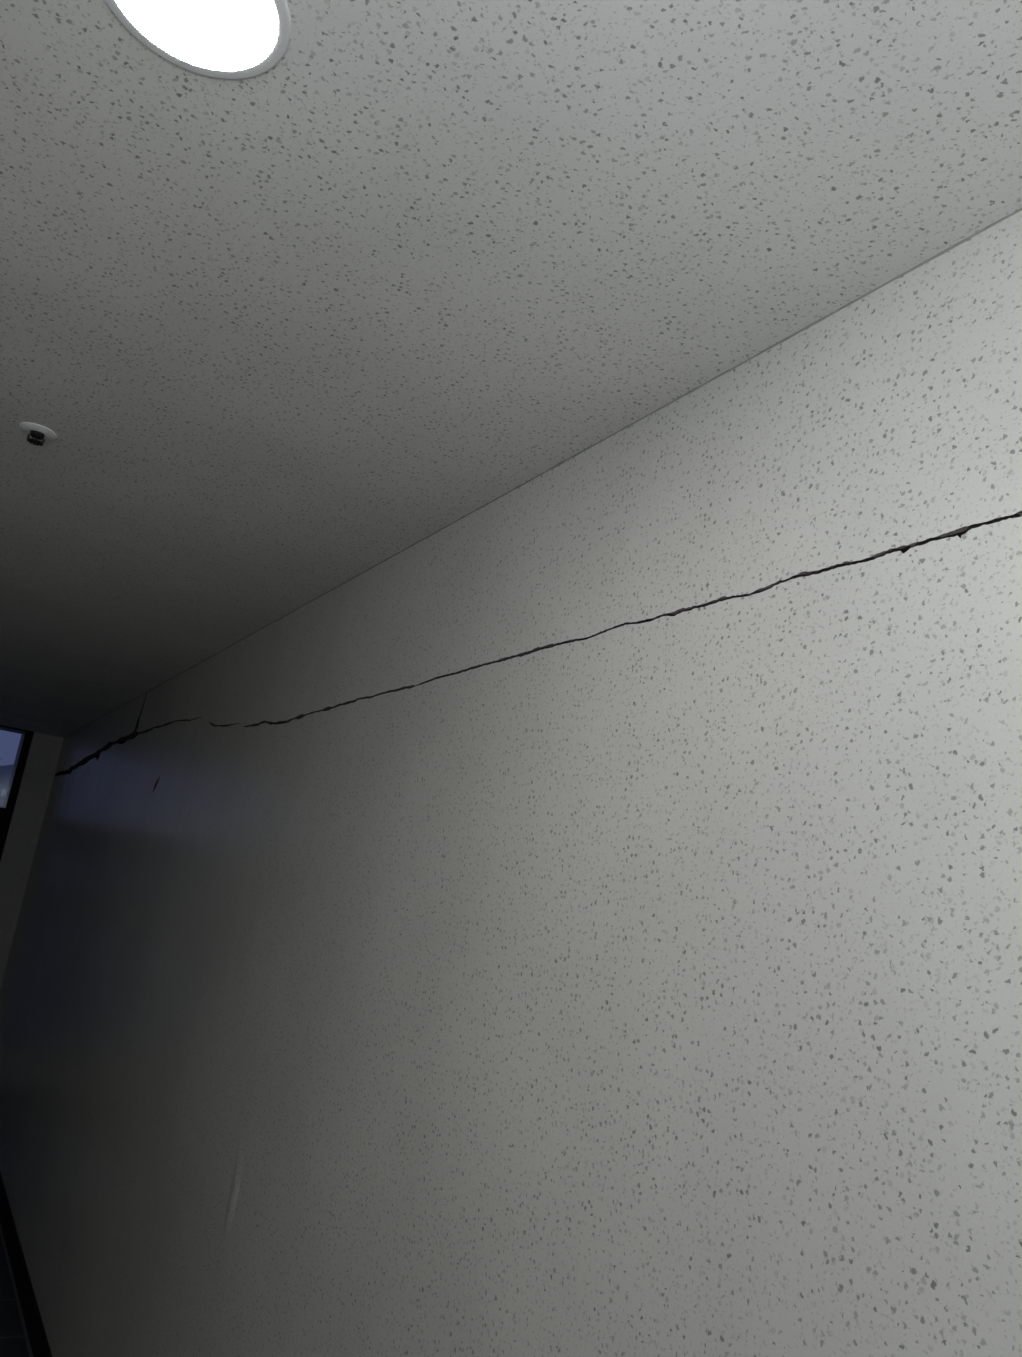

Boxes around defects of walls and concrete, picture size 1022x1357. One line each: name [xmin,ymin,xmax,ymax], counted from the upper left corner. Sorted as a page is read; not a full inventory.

crack [55,513,1022,776]